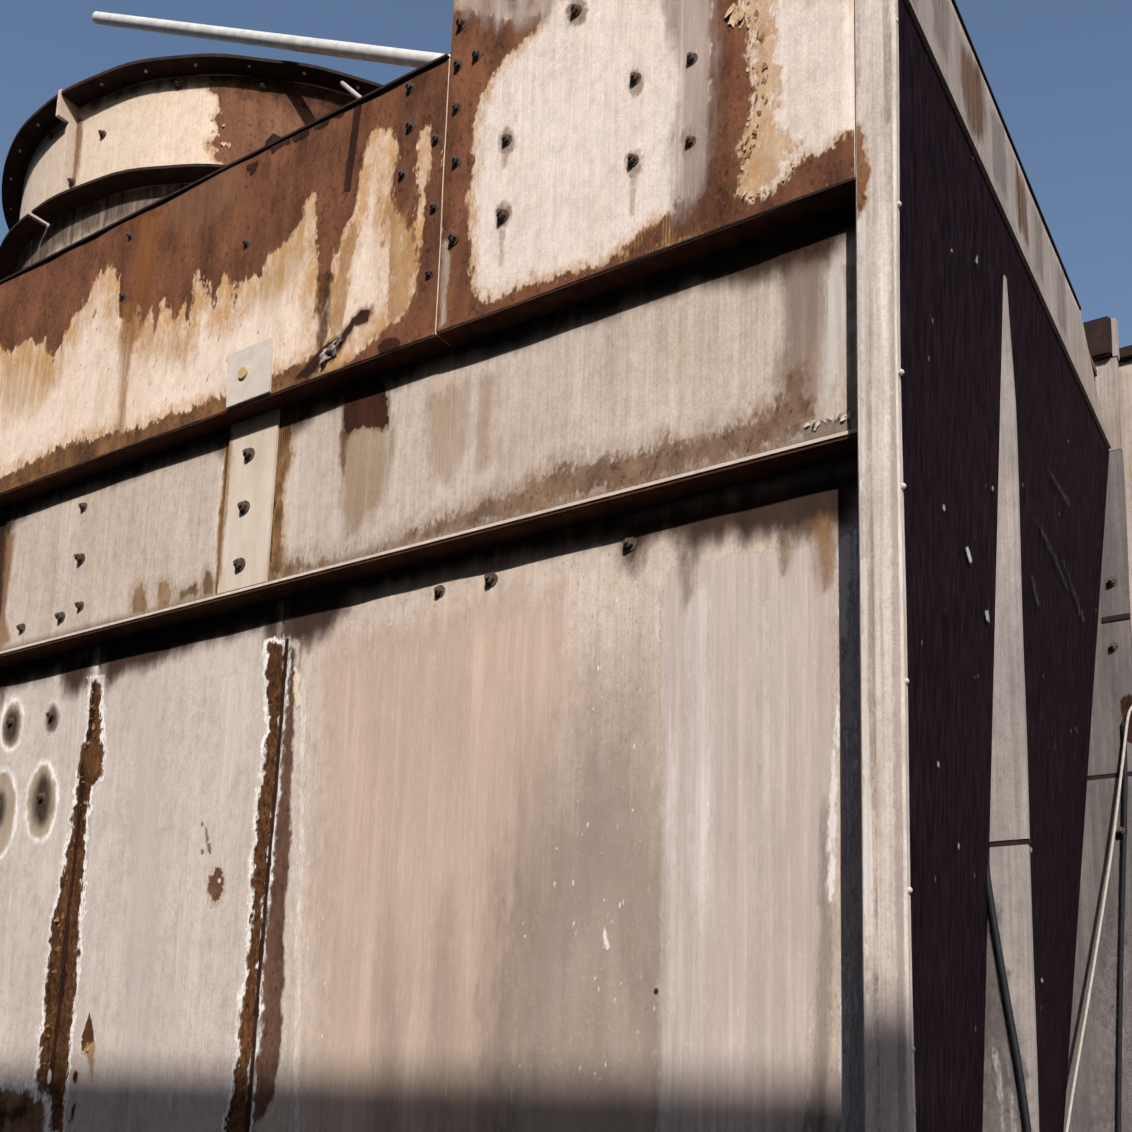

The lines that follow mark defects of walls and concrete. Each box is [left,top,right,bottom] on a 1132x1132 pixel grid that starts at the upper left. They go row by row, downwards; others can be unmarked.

corrosion [0,428,232,646]
corrosion [0,0,871,581]
peeling [724,0,803,200]
damp [783,207,871,496]
damp [292,666,307,1132]
corrosion [0,471,858,1132]
damp [320,515,878,1132]